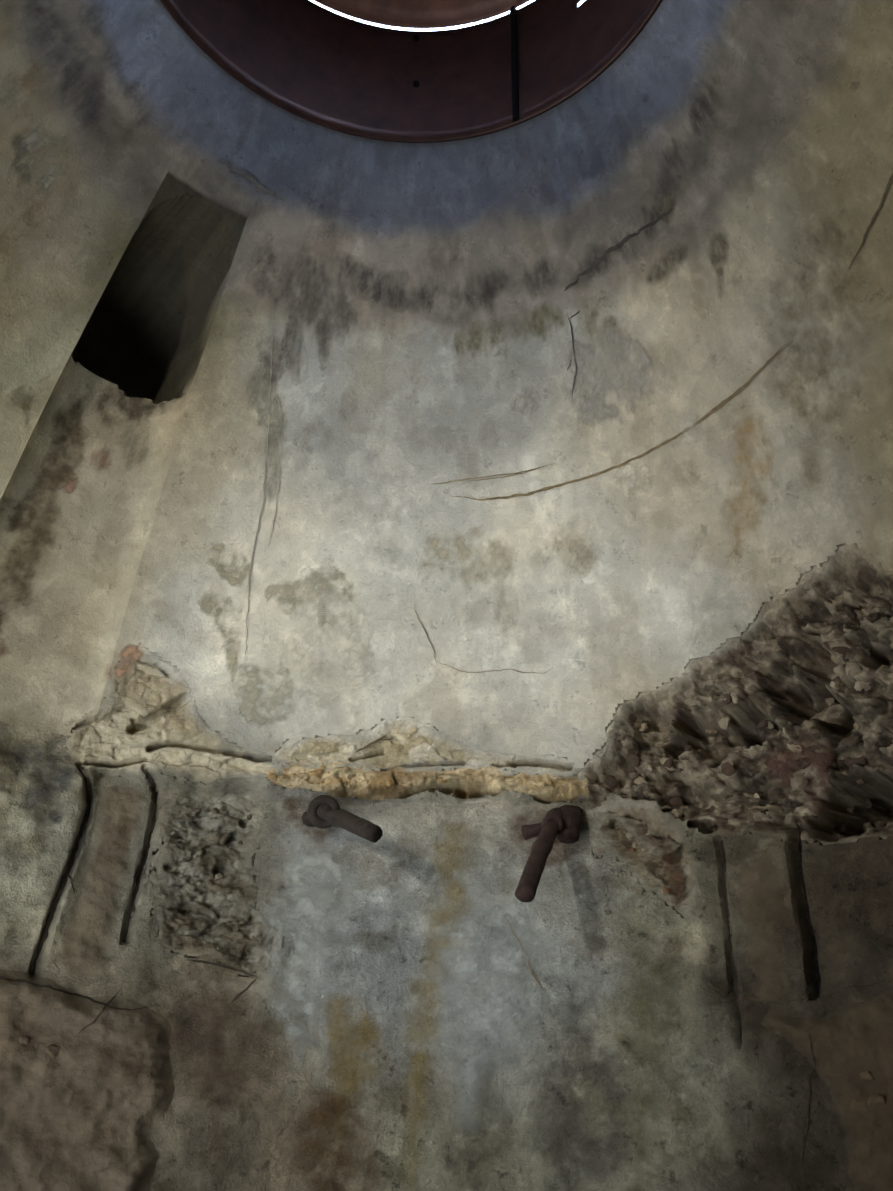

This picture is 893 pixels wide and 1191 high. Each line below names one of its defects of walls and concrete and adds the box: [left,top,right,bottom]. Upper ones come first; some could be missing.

water stain [98,389,163,418]
water stain [253,254,352,431]
crack [564,208,672,397]
water stain [2,401,82,601]
spalling [65,543,893,976]
water stain [269,848,341,1036]
water stain [441,914,521,1052]